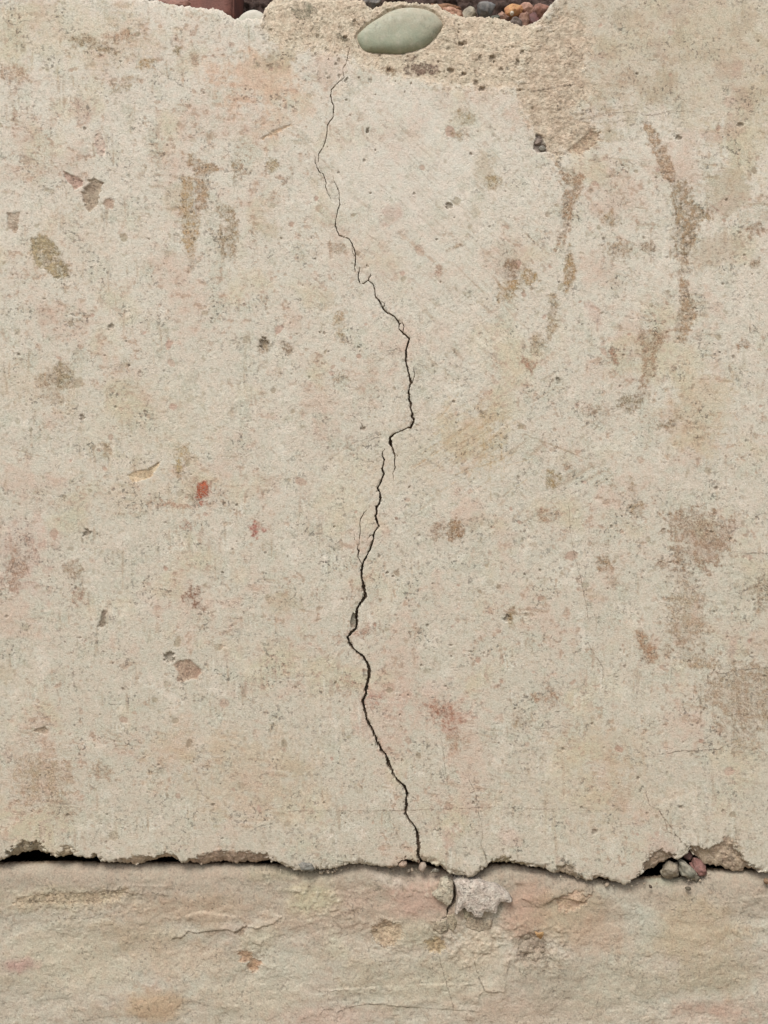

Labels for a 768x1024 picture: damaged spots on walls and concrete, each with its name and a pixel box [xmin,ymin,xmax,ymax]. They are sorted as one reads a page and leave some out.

crack [315,47,421,861]
spalling [7,839,102,861]
spalling [115,847,276,865]
spalling [636,835,760,877]
flaking render [423,854,530,955]
spalling [552,861,595,914]